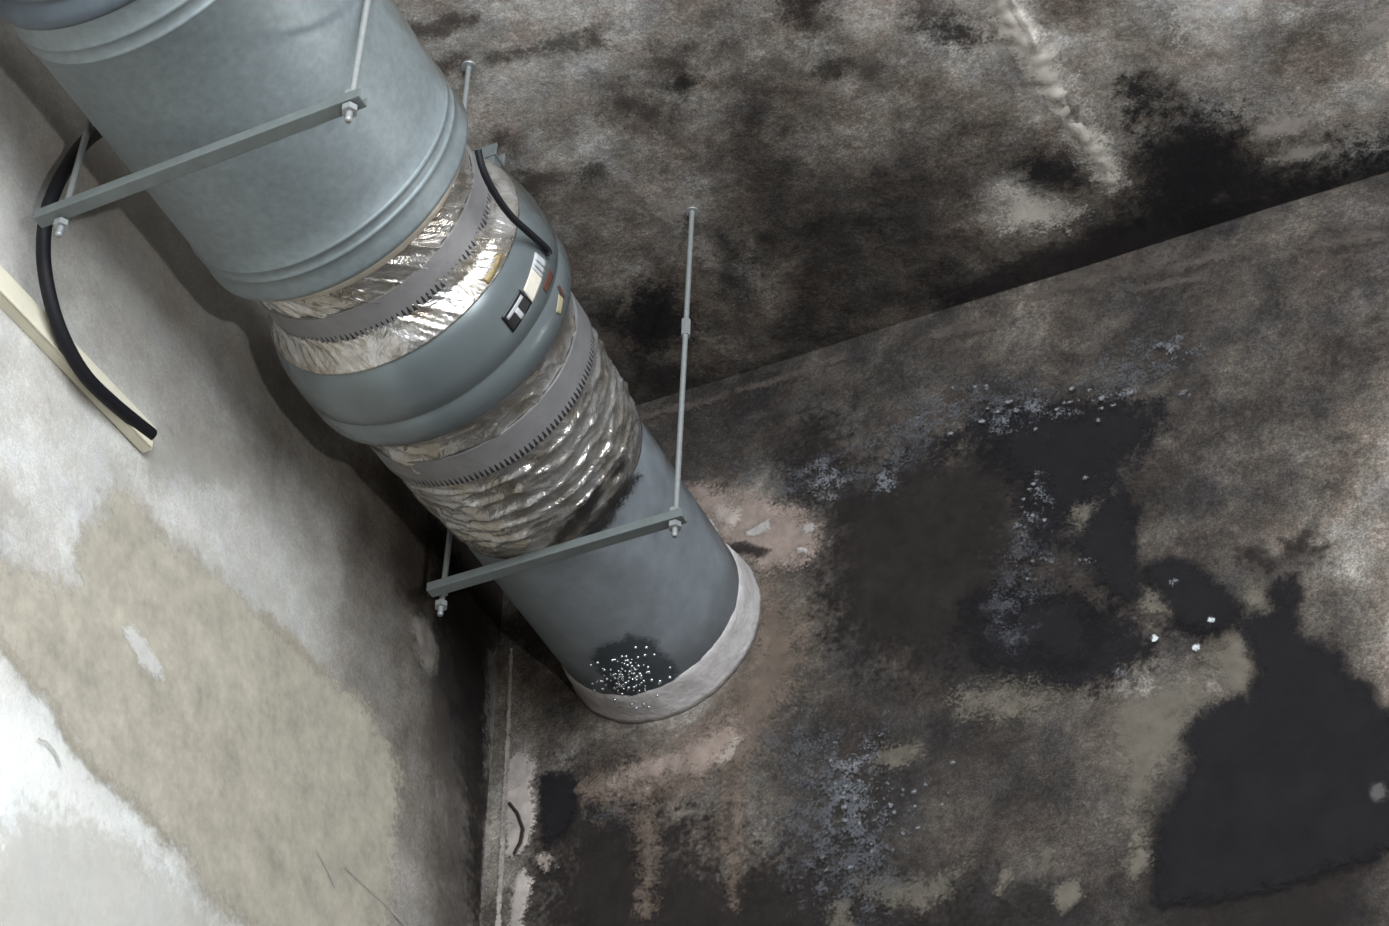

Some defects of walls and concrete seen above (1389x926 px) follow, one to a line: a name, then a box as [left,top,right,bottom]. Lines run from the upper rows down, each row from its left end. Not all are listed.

damp [408,12,481,75]
damp [487,24,605,63]
damp [601,40,705,142]
damp [775,0,842,38]
damp [812,43,890,83]
damp [904,0,994,44]
damp [940,67,1389,302]
damp [593,273,700,359]
damp [0,487,402,926]
damp [592,634,678,696]
damp [773,384,1389,909]
damp [534,709,1017,926]